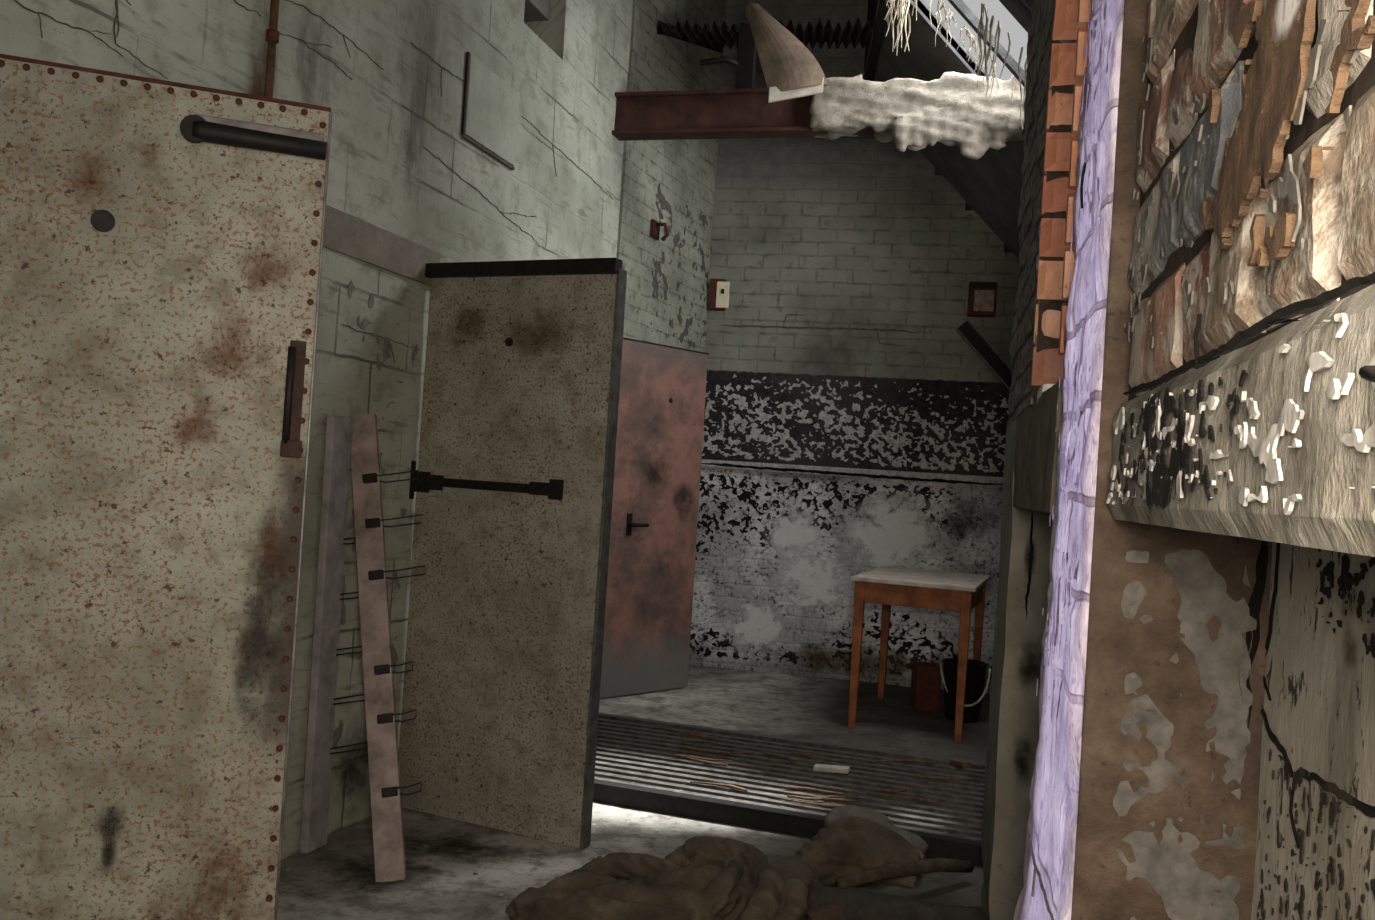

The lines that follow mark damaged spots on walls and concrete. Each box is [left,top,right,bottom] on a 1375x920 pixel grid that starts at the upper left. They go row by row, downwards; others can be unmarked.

crack [14,0,167,78]
crack [1123,272,1375,396]
peeling [695,374,1009,572]
spalling [1106,352,1355,515]
peeling [1341,421,1375,453]
spalling [690,612,958,679]
crack [1239,540,1375,849]